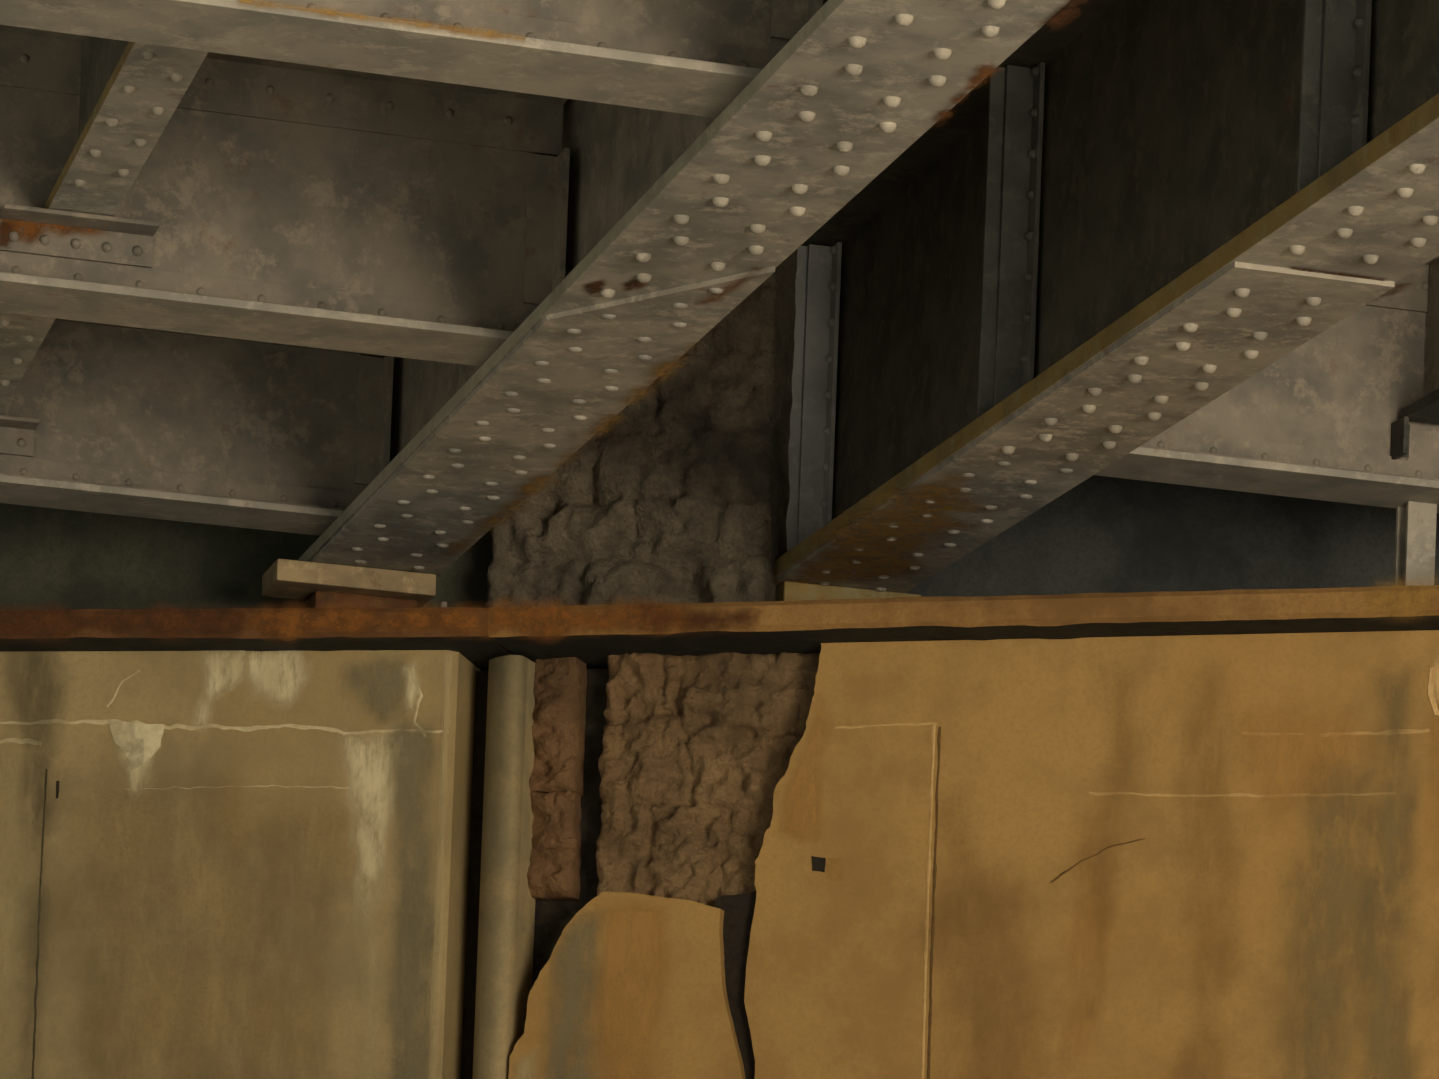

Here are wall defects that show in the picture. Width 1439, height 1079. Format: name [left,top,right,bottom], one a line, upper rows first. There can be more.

corrosion [0,219,98,246]
corrosion [777,482,975,585]
spalling [527,652,820,907]